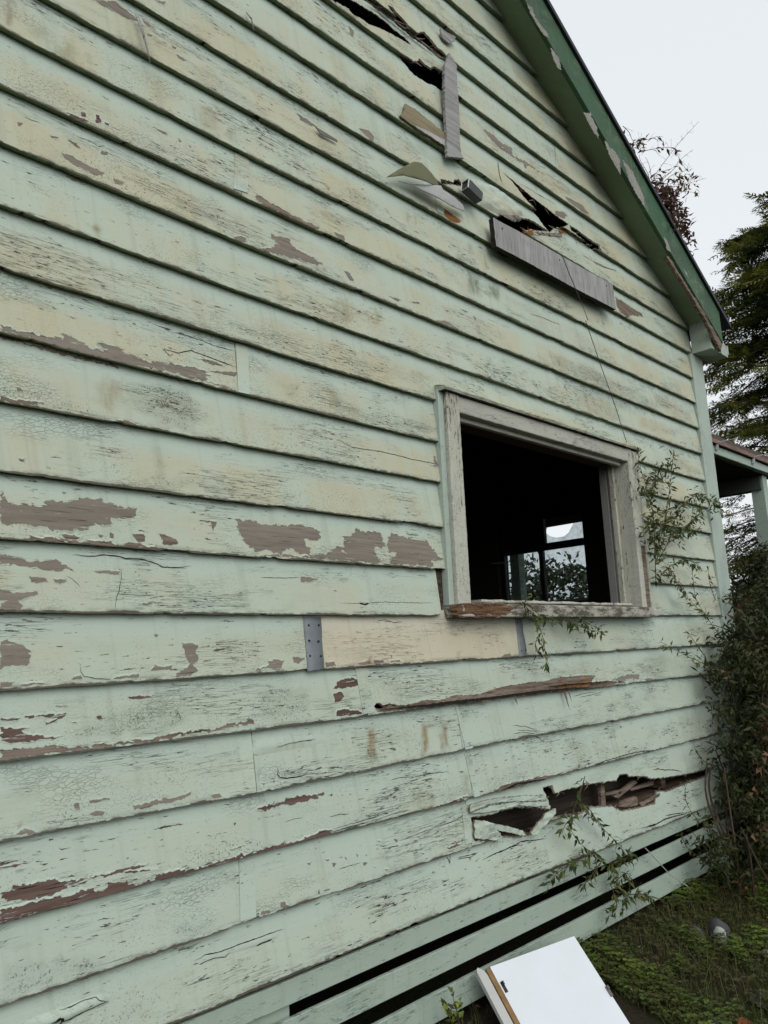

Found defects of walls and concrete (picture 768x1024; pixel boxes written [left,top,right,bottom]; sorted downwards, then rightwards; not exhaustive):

peeling [255,193,319,229]
peeling [234,234,323,266]
peeling [0,324,237,390]
peeling [0,490,178,550]
peeling [234,519,444,567]
peeling [0,637,44,688]
peeling [110,641,199,680]
peeling [256,657,305,671]
peeling [325,660,363,718]
peeling [0,711,254,762]
peeling [72,796,111,816]
peeling [0,828,333,923]